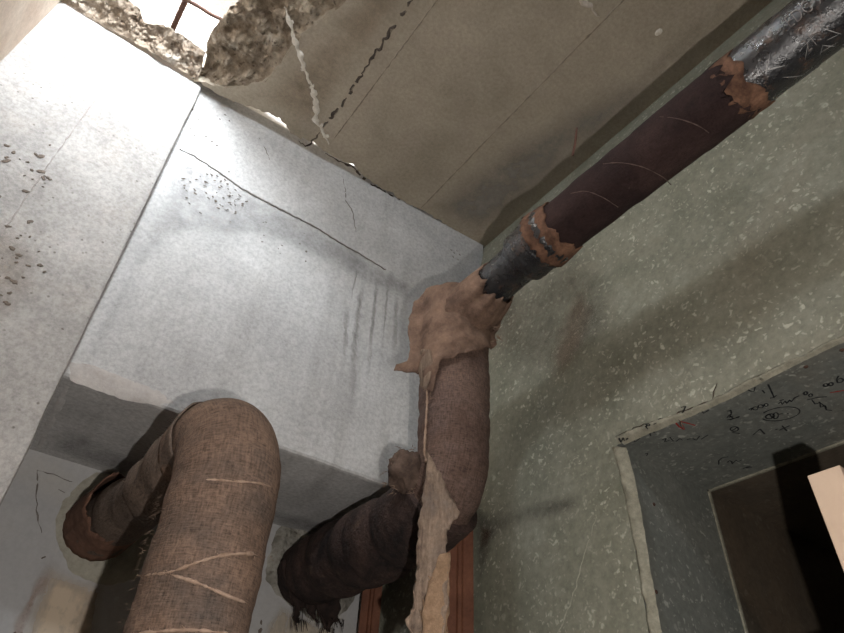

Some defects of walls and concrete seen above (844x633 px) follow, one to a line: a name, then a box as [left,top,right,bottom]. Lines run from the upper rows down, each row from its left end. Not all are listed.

spalling [61,0,346,88]
crack [284,0,413,229]